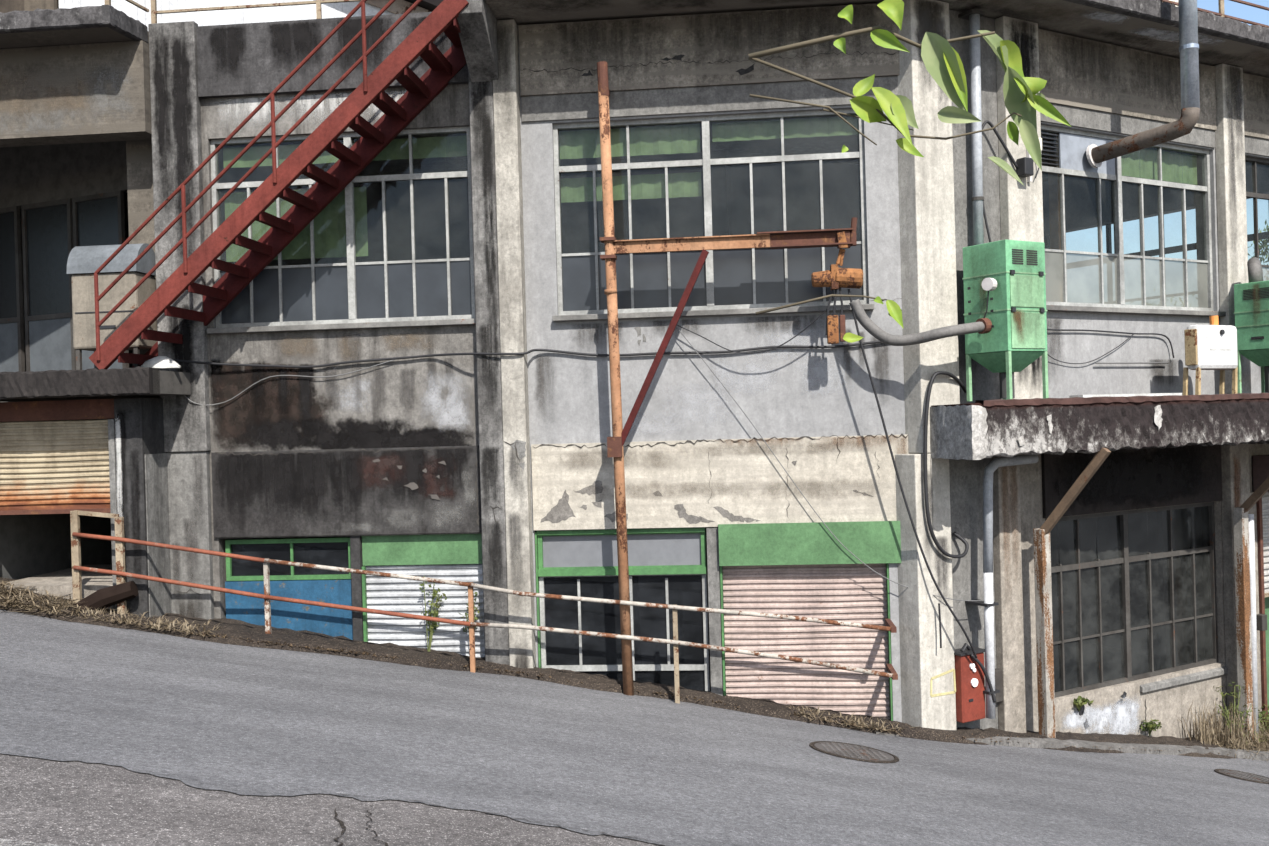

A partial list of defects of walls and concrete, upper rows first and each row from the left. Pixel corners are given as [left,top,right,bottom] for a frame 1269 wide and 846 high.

water stain [154,38,193,253]
water stain [471,29,508,229]
water stain [169,306,193,396]
water stain [480,245,497,396]
water stain [1020,319,1060,383]
water stain [195,339,517,525]
peeling [362,455,457,500]
flaking render [540,480,628,523]
flaking render [653,491,761,524]
water stain [489,516,521,583]
water stain [1064,699,1139,735]
crack [326,794,666,846]